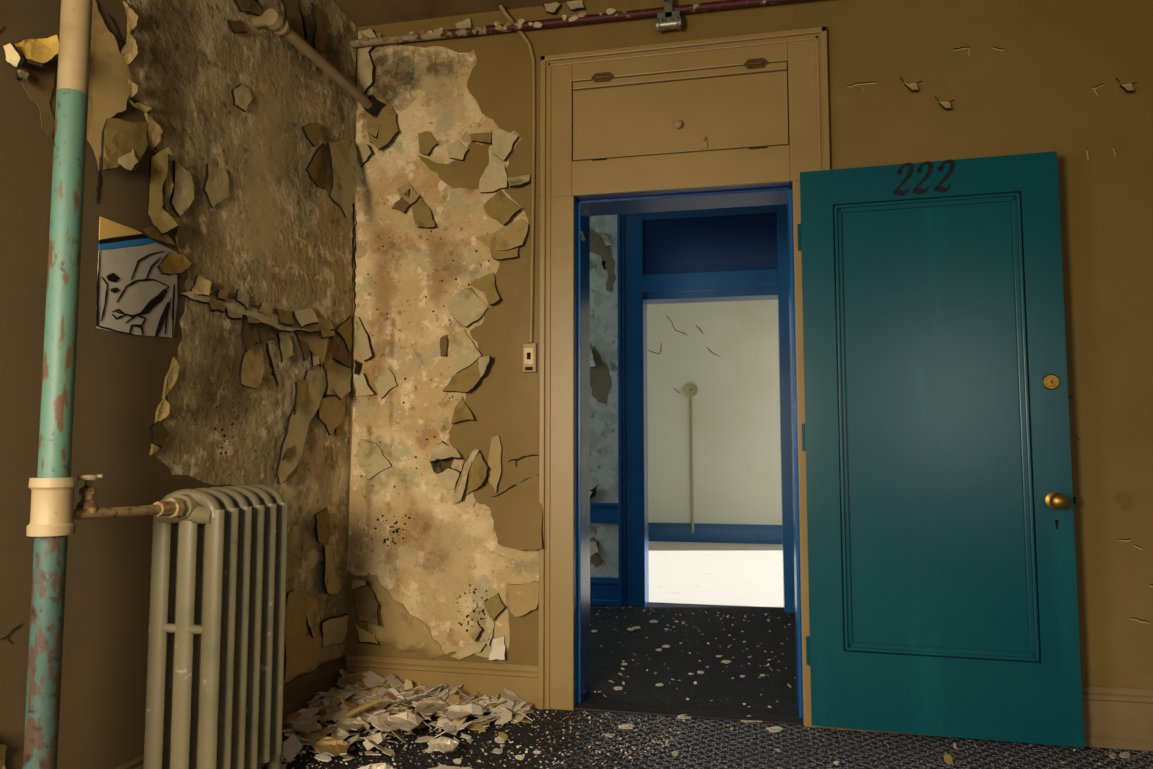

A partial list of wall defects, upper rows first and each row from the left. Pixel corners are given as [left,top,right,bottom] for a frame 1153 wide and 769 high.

peeling [581,229,616,292]
flaking render [86,0,539,683]
peeling [590,344,611,404]